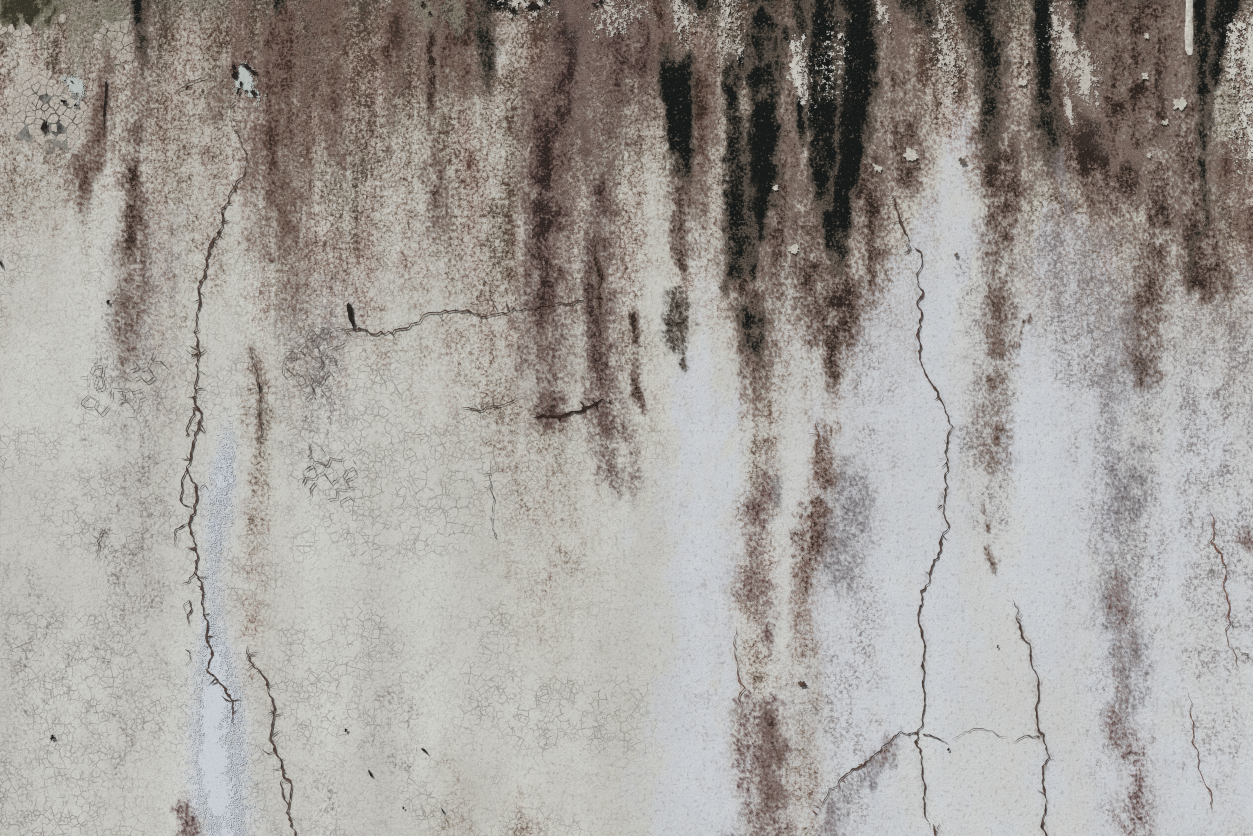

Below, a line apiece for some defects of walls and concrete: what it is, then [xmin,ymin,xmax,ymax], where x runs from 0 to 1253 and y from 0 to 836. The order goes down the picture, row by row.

peeling [0,0,68,49]
peeling [2,62,96,153]
water stain [64,0,157,374]
peeling [230,61,267,111]
water stain [206,0,352,323]
water stain [401,0,493,242]
crack [81,101,296,836]
water stain [248,347,266,438]
crack [302,443,359,504]
crack [248,243,610,447]
water stain [509,0,1253,836]
crack [812,192,1053,836]